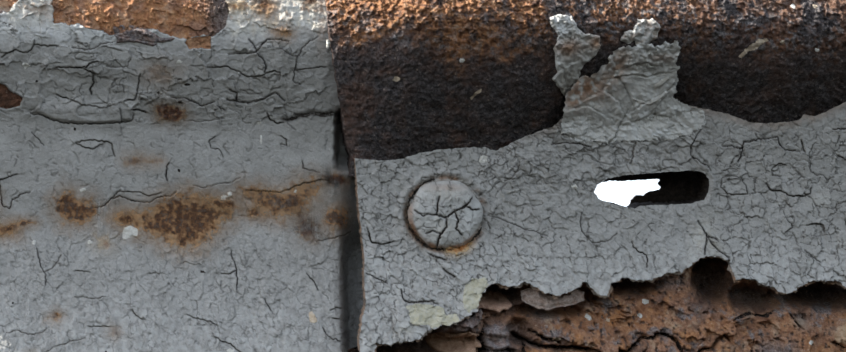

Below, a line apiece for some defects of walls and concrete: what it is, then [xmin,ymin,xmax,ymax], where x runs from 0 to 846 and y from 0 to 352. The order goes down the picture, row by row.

crack [31,42,144,150]
crack [172,39,336,156]
peeling [550,14,707,145]
crack [690,135,833,197]
rust [0,219,36,236]
rust [53,190,98,225]
rust [114,188,237,250]
rust [238,171,349,241]
crack [416,198,543,277]
peeling [406,303,459,328]
peeling [463,277,489,313]
peeling [520,288,584,310]